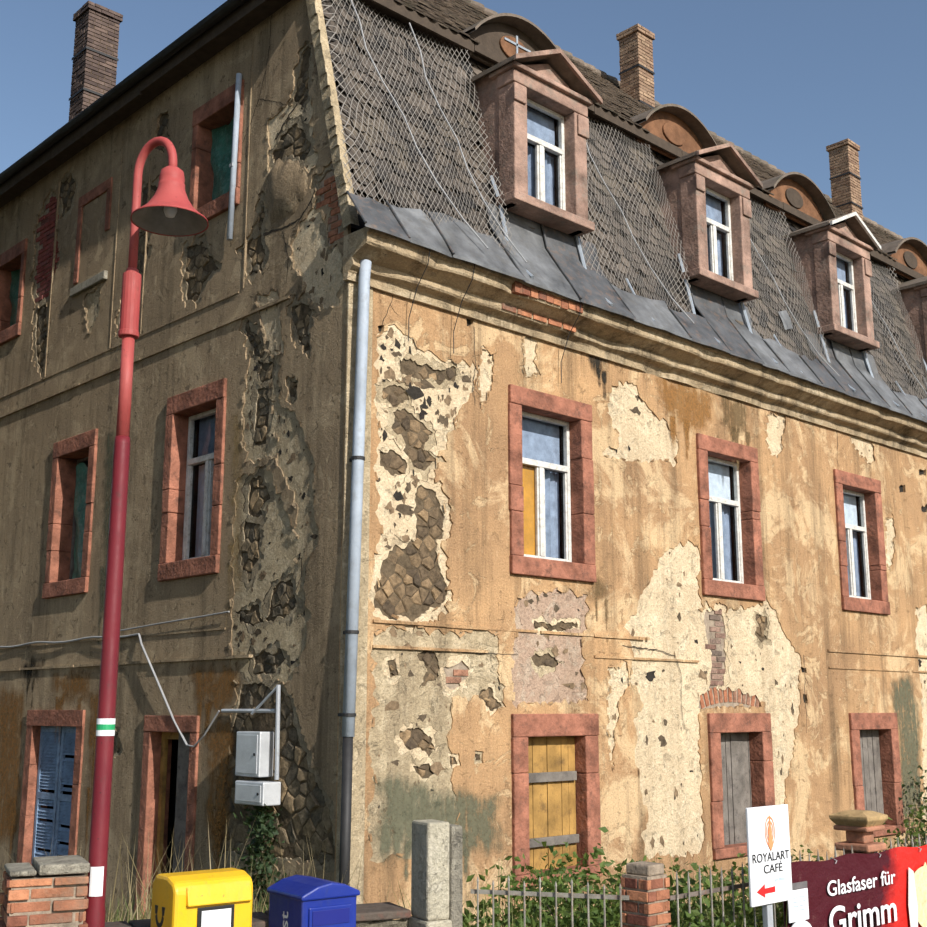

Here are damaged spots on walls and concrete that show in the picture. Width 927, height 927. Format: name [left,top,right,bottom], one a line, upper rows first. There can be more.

flaking render [30,166,78,377]
flaking render [137,228,153,283]
flaking render [141,176,159,207]
flaking render [180,234,222,306]
flaking render [213,41,347,873]
flaking render [602,381,678,467]
flaking render [367,324,590,863]
flaking render [606,541,801,860]
flaking render [915,605,927,820]